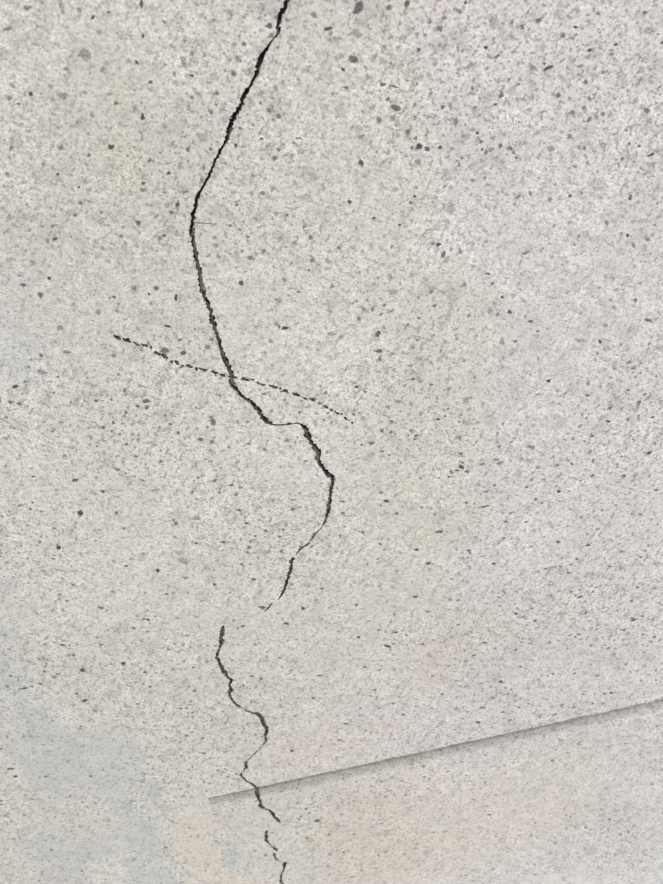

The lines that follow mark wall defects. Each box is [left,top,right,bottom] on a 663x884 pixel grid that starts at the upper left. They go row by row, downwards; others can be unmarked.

crack [114,0,353,884]